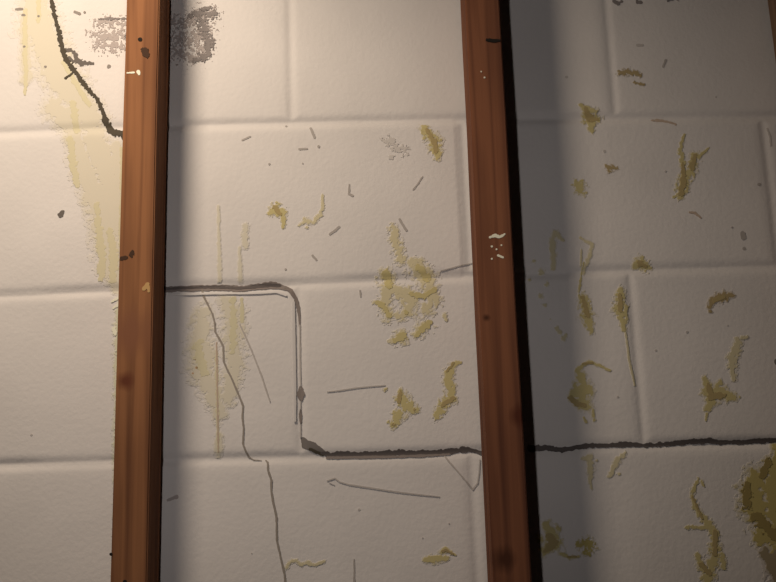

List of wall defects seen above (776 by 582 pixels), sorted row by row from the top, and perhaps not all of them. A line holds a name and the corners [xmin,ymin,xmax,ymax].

crack [50,0,123,139]
damp [417,124,446,162]
damp [7,0,123,529]
damp [371,222,448,348]
crack [164,281,305,582]
crack [327,385,385,393]
crack [327,478,440,497]
damp [382,386,421,431]
crack [321,446,482,491]
damp [432,359,462,422]
crack [527,437,776,453]
damp [731,442,776,582]